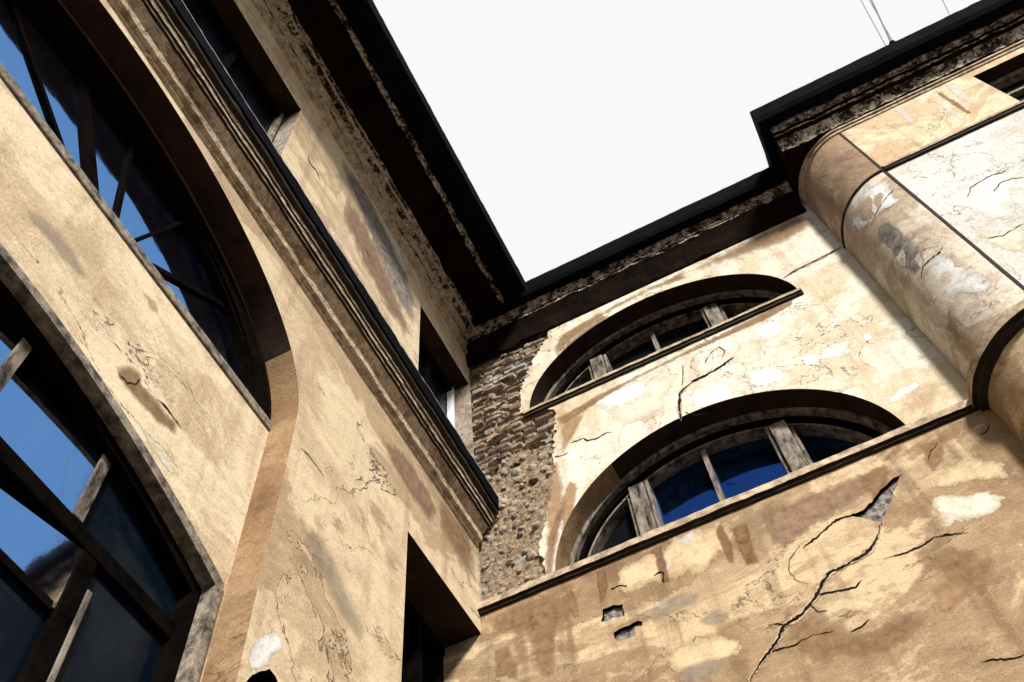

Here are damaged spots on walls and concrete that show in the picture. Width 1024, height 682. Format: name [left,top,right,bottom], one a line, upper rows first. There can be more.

peeling [852,182,899,231]
peeling [922,256,990,299]
leakage [120,368,175,430]
crack [676,346,734,420]
spalling [469,331,556,602]
spalling [852,474,902,521]
peeling [932,457,1009,527]
peeling [601,521,734,642]
crack [747,513,968,682]
peeling [246,632,283,682]